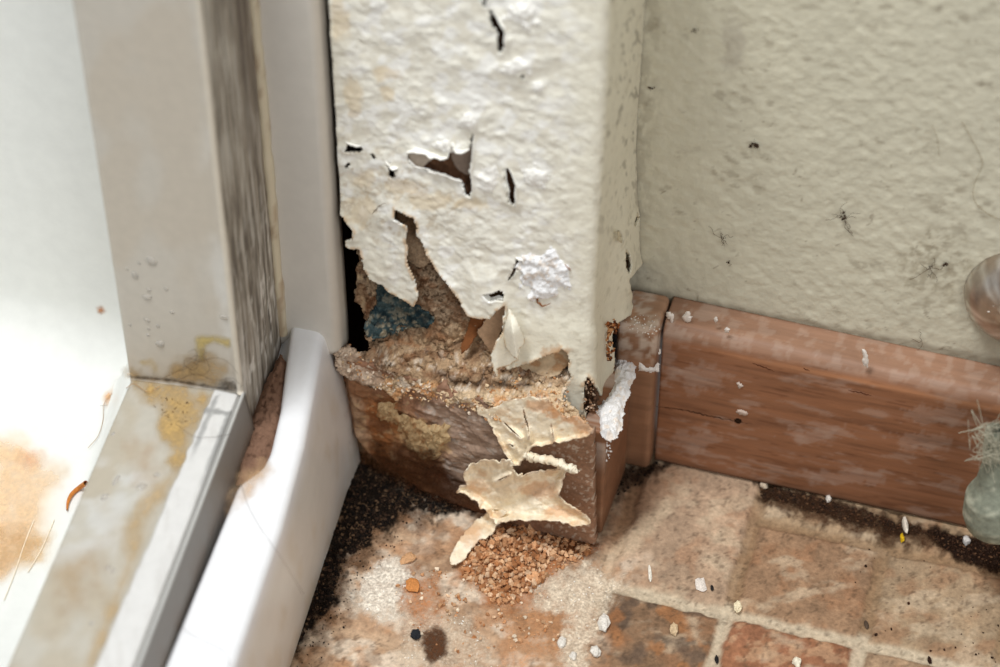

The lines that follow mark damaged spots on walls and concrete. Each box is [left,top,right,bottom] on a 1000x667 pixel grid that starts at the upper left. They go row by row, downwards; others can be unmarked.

crack [483,0,507,52]
spalling [424,153,472,196]
leakage [514,246,572,302]
flaking render [333,249,593,565]
leakage [595,349,661,462]